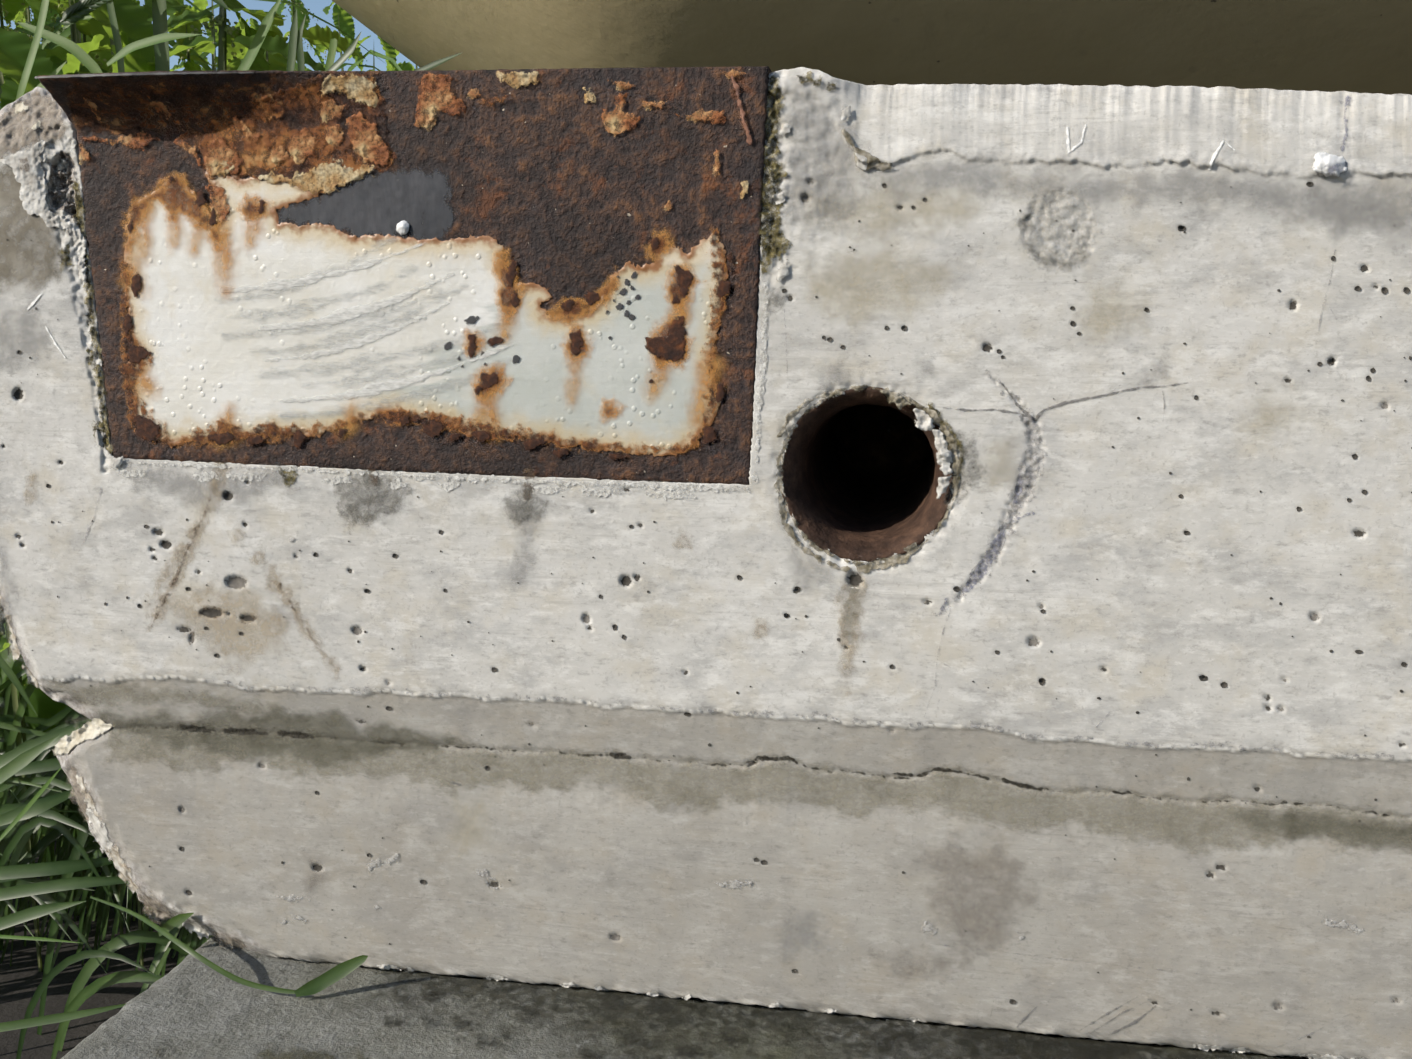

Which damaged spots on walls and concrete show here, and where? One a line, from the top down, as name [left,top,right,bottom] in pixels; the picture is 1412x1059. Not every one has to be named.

peeling [0,72,454,258]
corrosion [119,173,732,460]
spalling [0,595,41,688]
crack [120,724,403,745]
crack [560,752,1061,792]
spalling [52,718,245,949]
water stain [384,986,503,1048]
water stain [1096,1041,1136,1059]